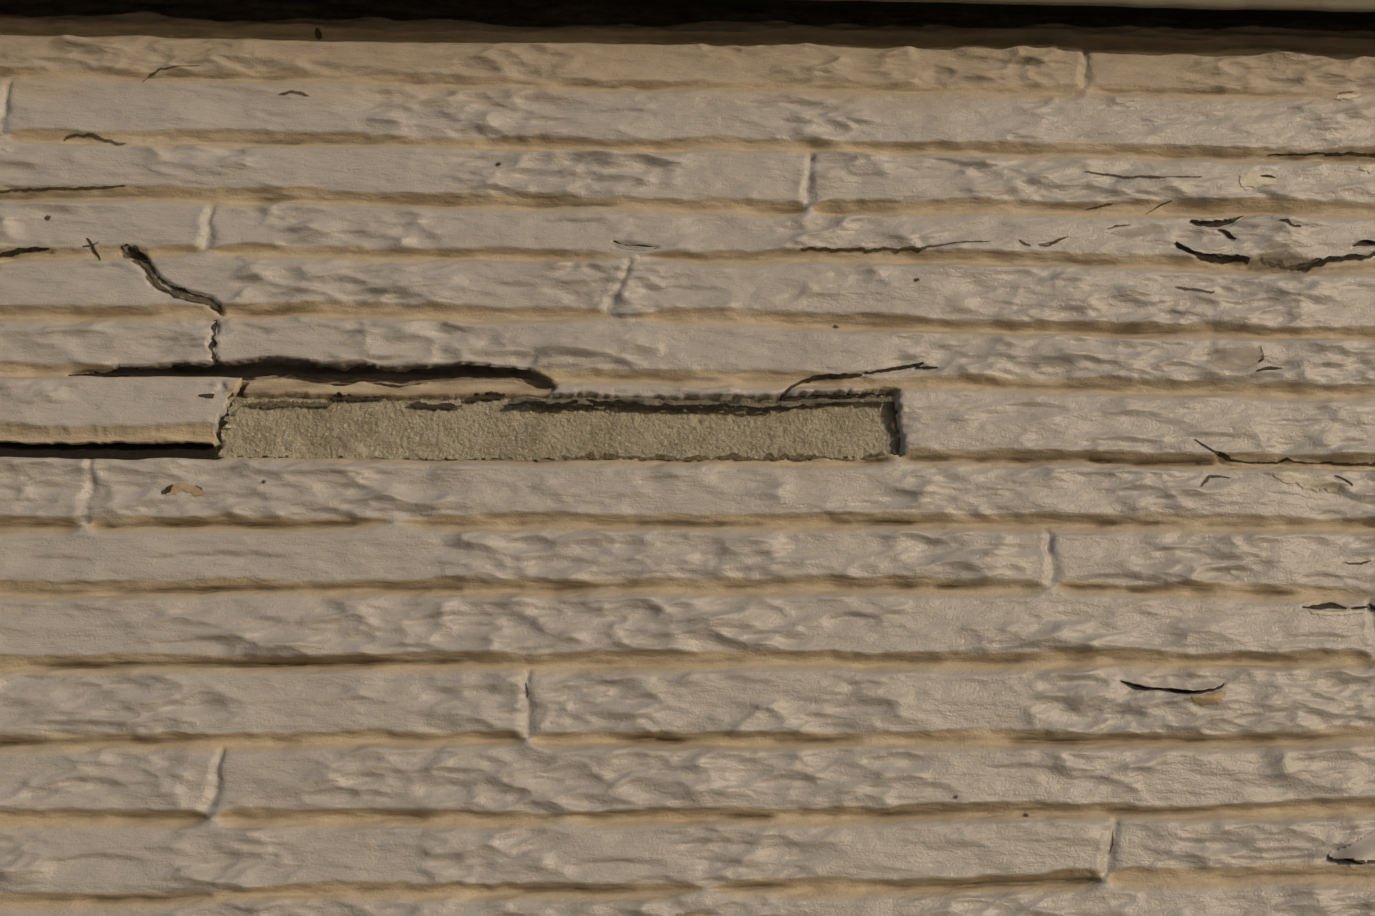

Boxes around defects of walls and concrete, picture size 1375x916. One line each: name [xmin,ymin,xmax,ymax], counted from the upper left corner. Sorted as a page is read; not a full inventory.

crack [63,133,126,145]
crack [1268,150,1375,158]
crack [0,185,126,193]
crack [801,171,1251,293]
crack [1280,219,1301,227]
crack [0,247,49,257]
crack [1296,238,1375,273]
crack [69,238,553,386]
crack [779,362,938,401]
spalling [219,391,900,462]
crack [1194,439,1375,487]
crack [1121,676,1225,694]